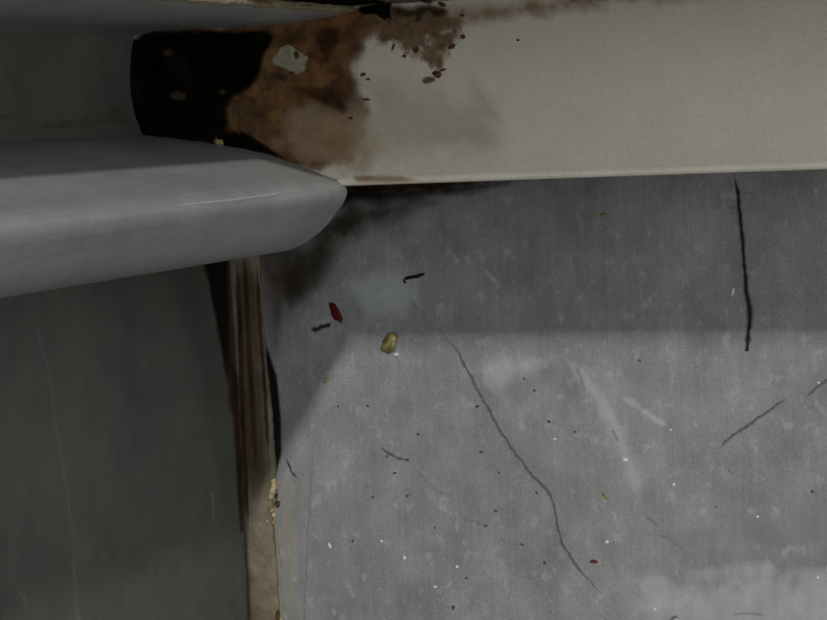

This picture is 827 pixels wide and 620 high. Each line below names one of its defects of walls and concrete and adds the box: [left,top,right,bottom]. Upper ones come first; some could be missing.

spalling [270,45,308,80]
corrosion [138,1,593,170]
crack [735,181,752,351]
crack [382,448,449,496]
crack [449,342,594,586]
crack [722,399,786,445]